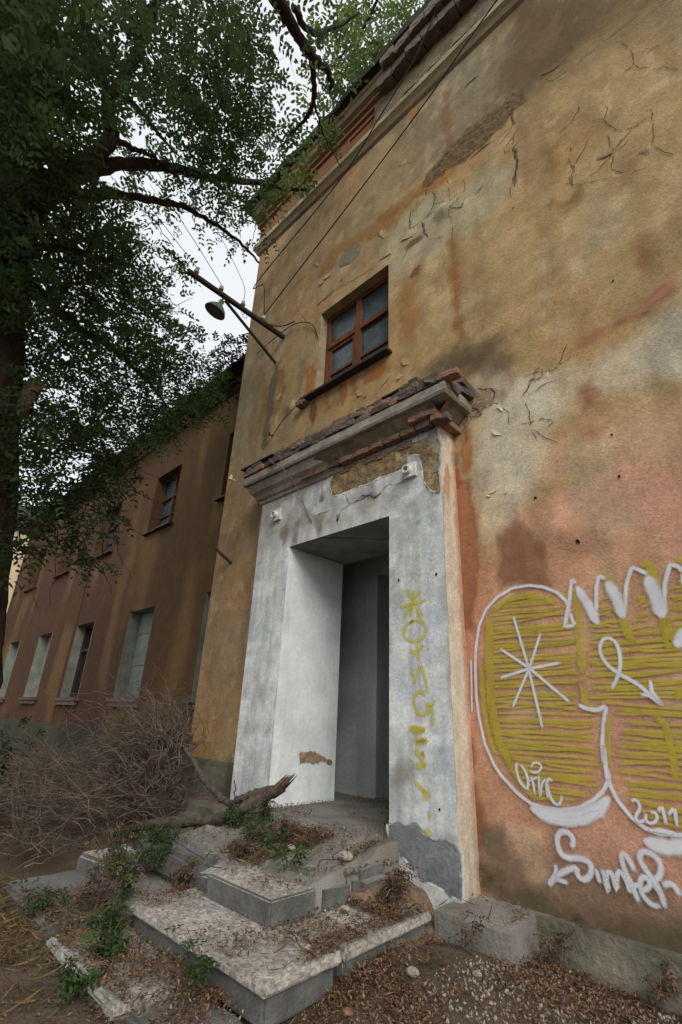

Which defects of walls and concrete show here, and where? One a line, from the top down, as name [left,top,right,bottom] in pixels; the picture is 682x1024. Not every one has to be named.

crack [539,20,678,82]
crack [409,112,520,239]
spalling [423,88,525,188]
crack [563,106,673,185]
crack [466,345,571,443]
spalling [329,434,459,497]
leakage [497,525,546,585]
spalling [299,751,332,765]
spalling [386,820,465,904]